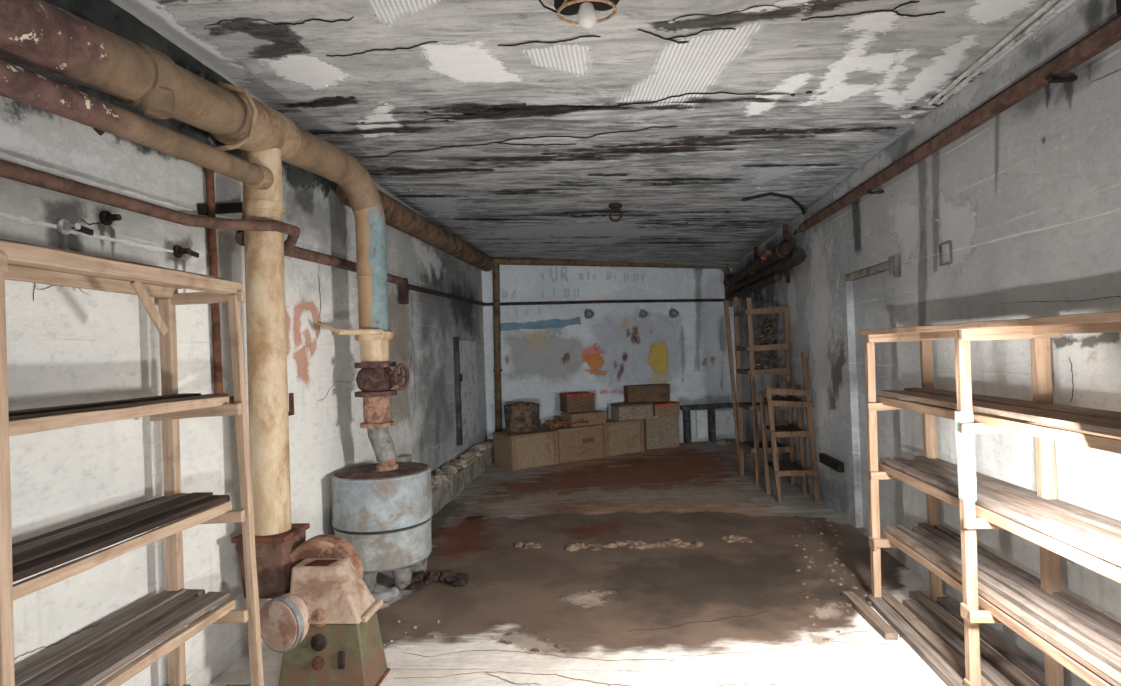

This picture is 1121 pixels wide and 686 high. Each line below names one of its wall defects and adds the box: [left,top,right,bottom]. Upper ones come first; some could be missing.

crack [274,16,354,25]
crack [326,41,438,57]
crack [498,35,600,46]
crack [638,28,736,44]
crack [801,1,945,21]
damp [308,92,824,135]
damp [369,127,898,195]
crack [901,208,1121,263]
damp [388,294,412,418]
damp [376,503,906,654]